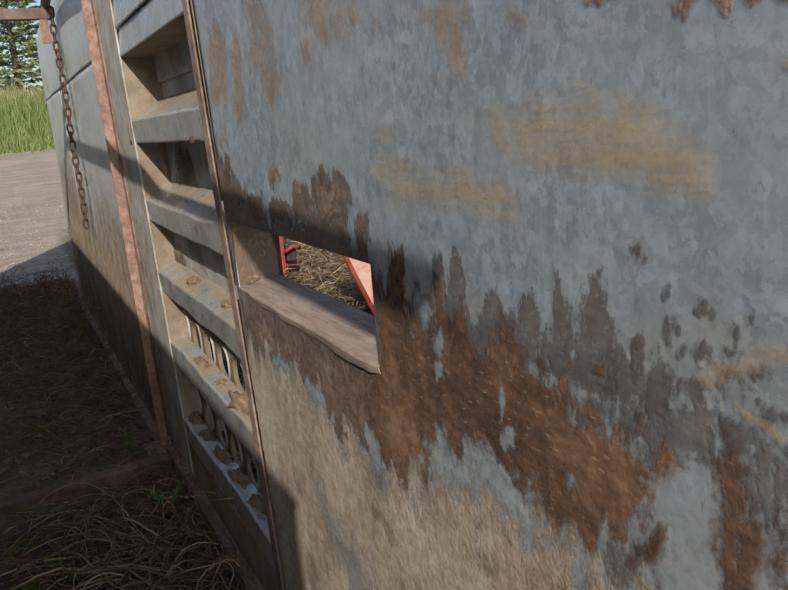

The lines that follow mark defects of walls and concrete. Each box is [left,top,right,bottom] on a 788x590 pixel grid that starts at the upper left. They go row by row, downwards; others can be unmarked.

rust [241,255,676,569]
rust [663,315,713,364]
rust [710,442,788,590]